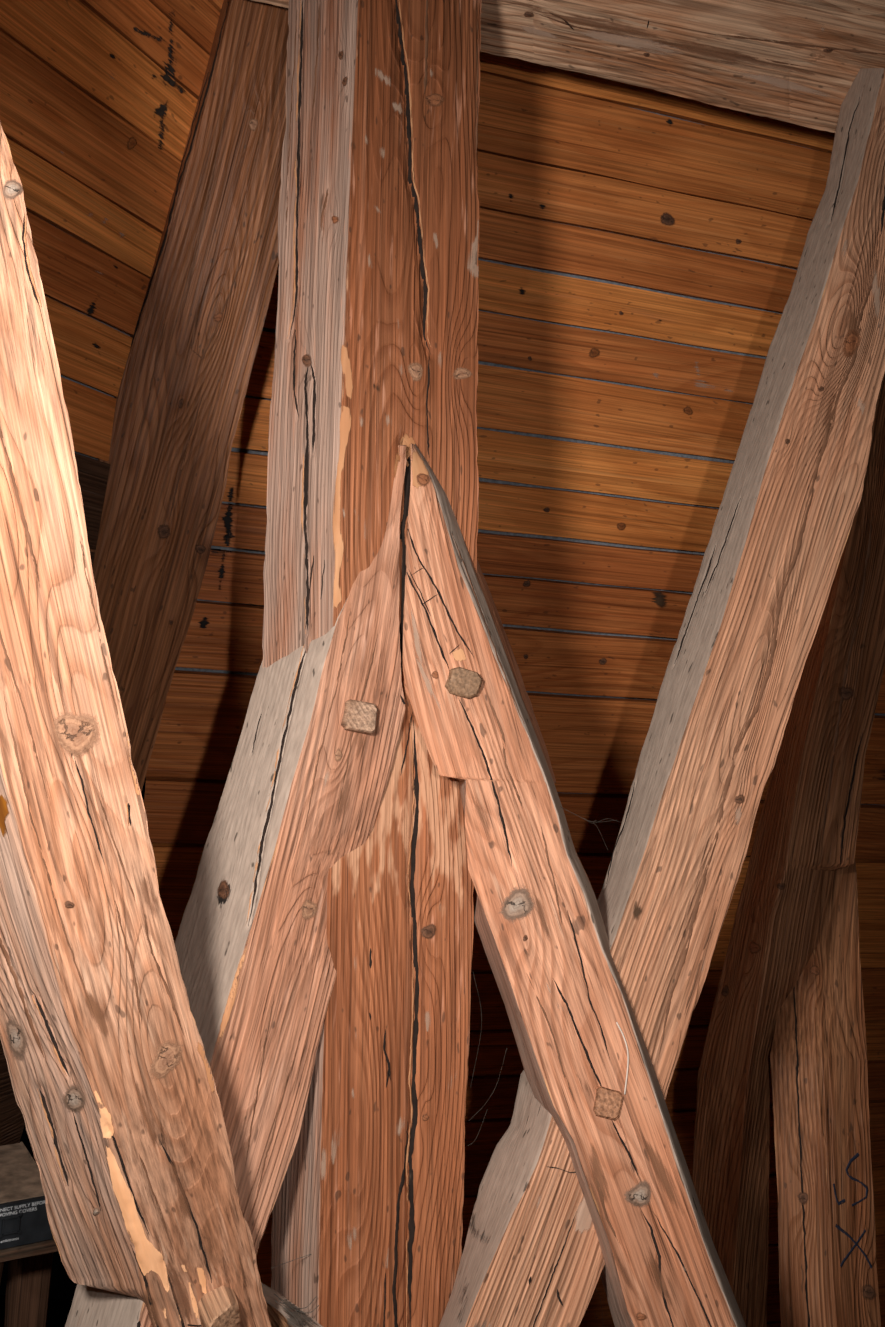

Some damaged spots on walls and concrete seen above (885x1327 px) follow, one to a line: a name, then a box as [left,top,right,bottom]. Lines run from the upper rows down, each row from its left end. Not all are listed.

peeling [94,1091,207,1321]
crack [245,999,300,1192]
crack [247,0,328,926]
crack [304,0,620,1327]